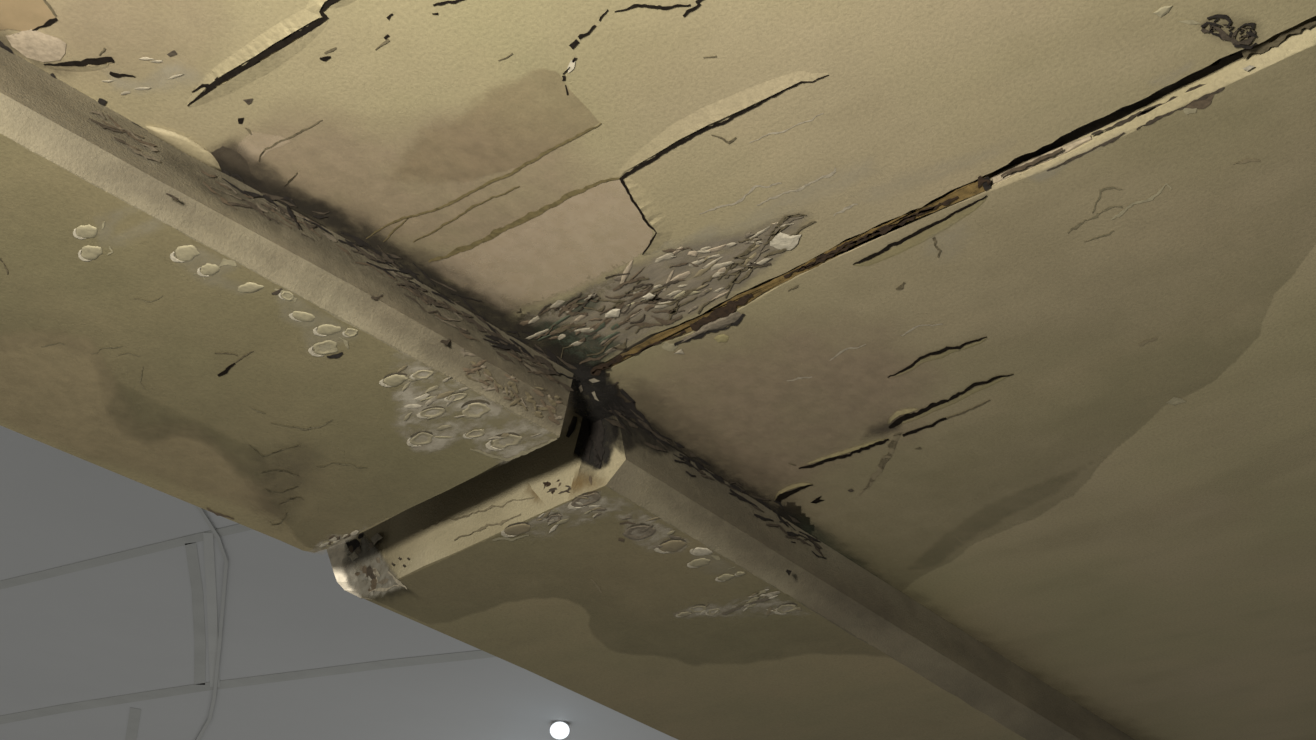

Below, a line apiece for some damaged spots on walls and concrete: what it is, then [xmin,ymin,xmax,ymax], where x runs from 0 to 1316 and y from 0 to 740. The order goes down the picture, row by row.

crack [187,0,356,107]
crack [562,0,702,95]
leakage [1153,5,1257,49]
leakage [89,98,160,162]
crack [619,71,828,256]
peeling [429,178,816,366]
crack [853,195,988,290]
leakage [201,144,836,559]
crack [888,337,988,379]
crack [774,374,1014,504]
spalling [317,530,410,599]
leakage [676,589,801,617]